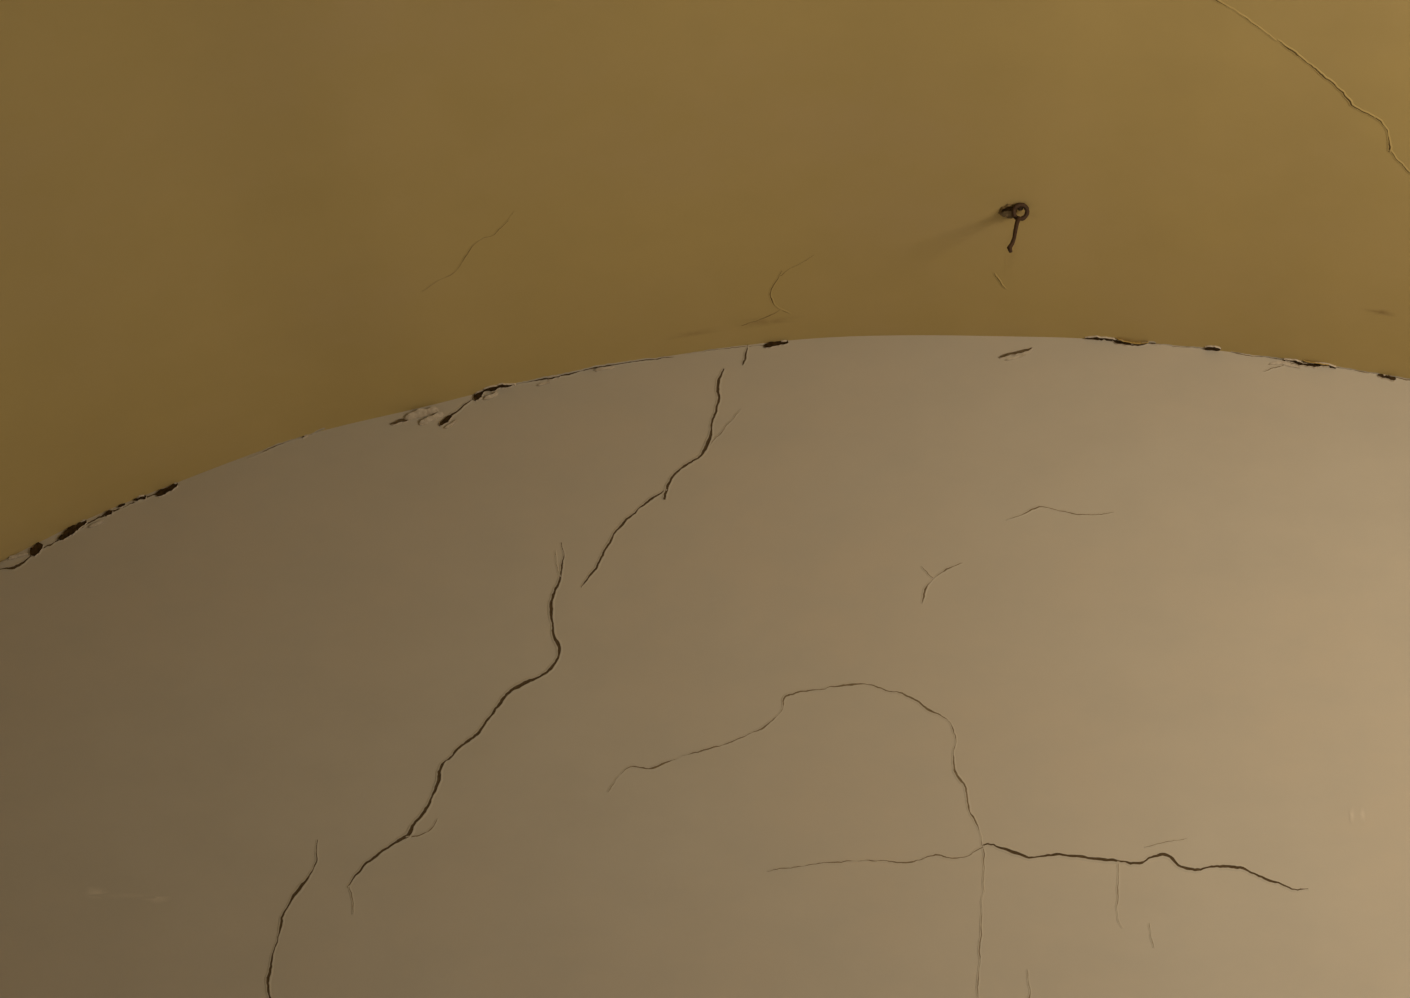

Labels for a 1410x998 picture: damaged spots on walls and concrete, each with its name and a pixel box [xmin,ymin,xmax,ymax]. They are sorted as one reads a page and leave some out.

crack [1214,0,1410,175]
crack [346,254,815,915]
crack [264,840,319,998]
crack [607,682,1309,998]